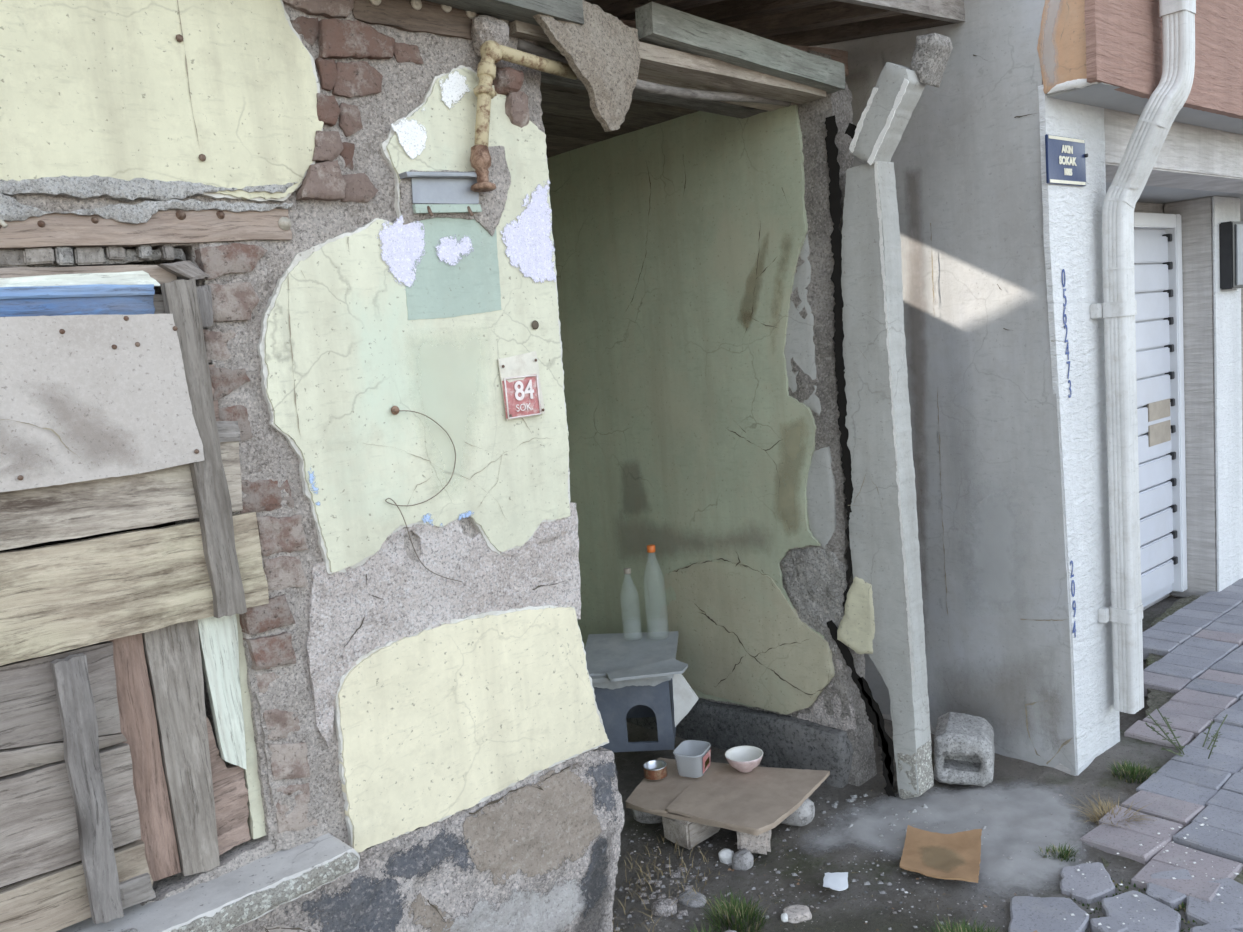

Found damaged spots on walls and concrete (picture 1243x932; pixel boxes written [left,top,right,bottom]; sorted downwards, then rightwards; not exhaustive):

flaking render [0,0,481,290]
peeling [500,180,556,283]
flaking render [784,235,821,416]
spalling [306,502,581,747]
crack [669,552,778,588]
crack [695,115,896,798]
flaking render [806,447,836,549]
leakage [442,843,607,932]